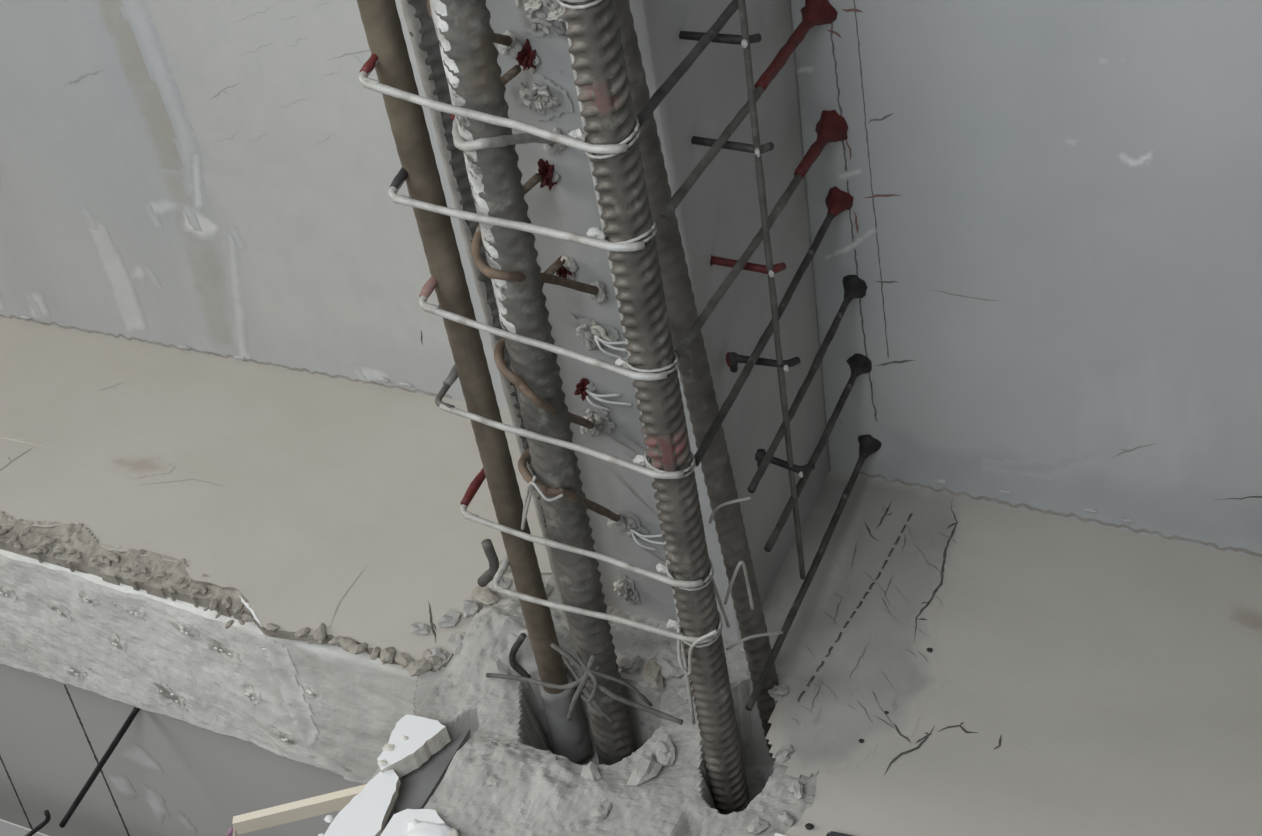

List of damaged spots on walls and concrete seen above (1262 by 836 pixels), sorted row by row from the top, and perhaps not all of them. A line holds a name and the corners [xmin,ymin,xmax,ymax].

water stain [89,0,247,351]
spalling [294,0,971,836]
spalling [0,510,279,632]
spalling [164,618,240,662]
spalling [151,681,187,712]
spalling [272,731,304,749]
crack [884,722,1001,775]